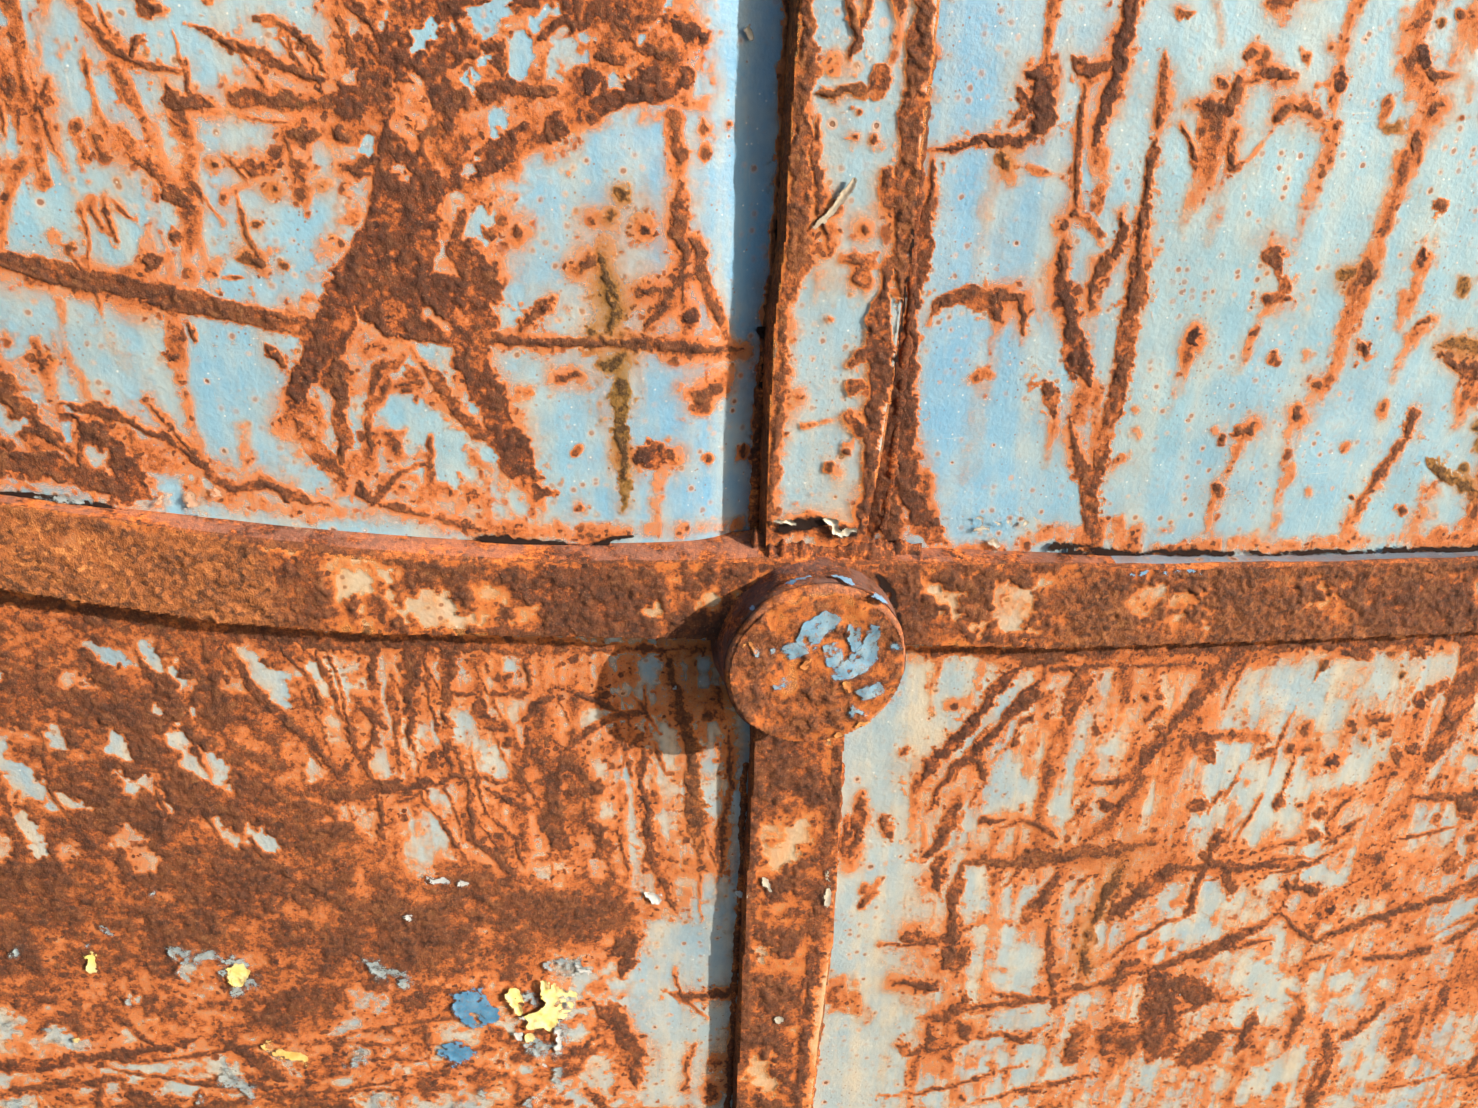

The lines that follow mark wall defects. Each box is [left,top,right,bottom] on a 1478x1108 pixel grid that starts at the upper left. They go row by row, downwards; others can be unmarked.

corrosion [0,0,733,544]
corrosion [674,0,1478,555]
corrosion [0,471,1478,1108]
peeling [426,876,469,887]
peeling [644,891,663,905]
peeling [84,925,114,974]
peeling [166,947,257,997]
peeling [357,959,414,990]
peeling [437,957,592,1089]
peeling [261,1040,308,1066]
peeling [352,1045,369,1068]
peeling [217,1062,255,1101]